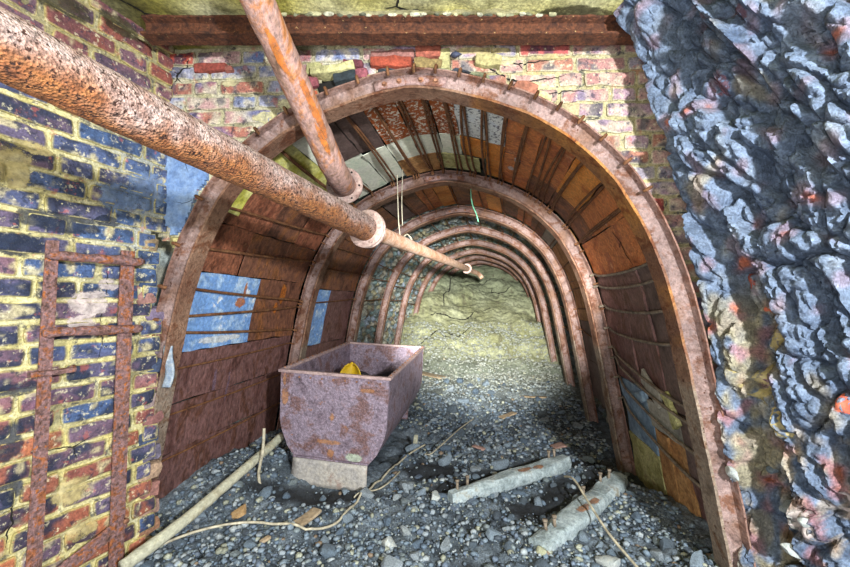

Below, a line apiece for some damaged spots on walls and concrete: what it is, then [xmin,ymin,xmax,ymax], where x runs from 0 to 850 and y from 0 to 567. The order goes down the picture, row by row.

crack [386,0,420,11]